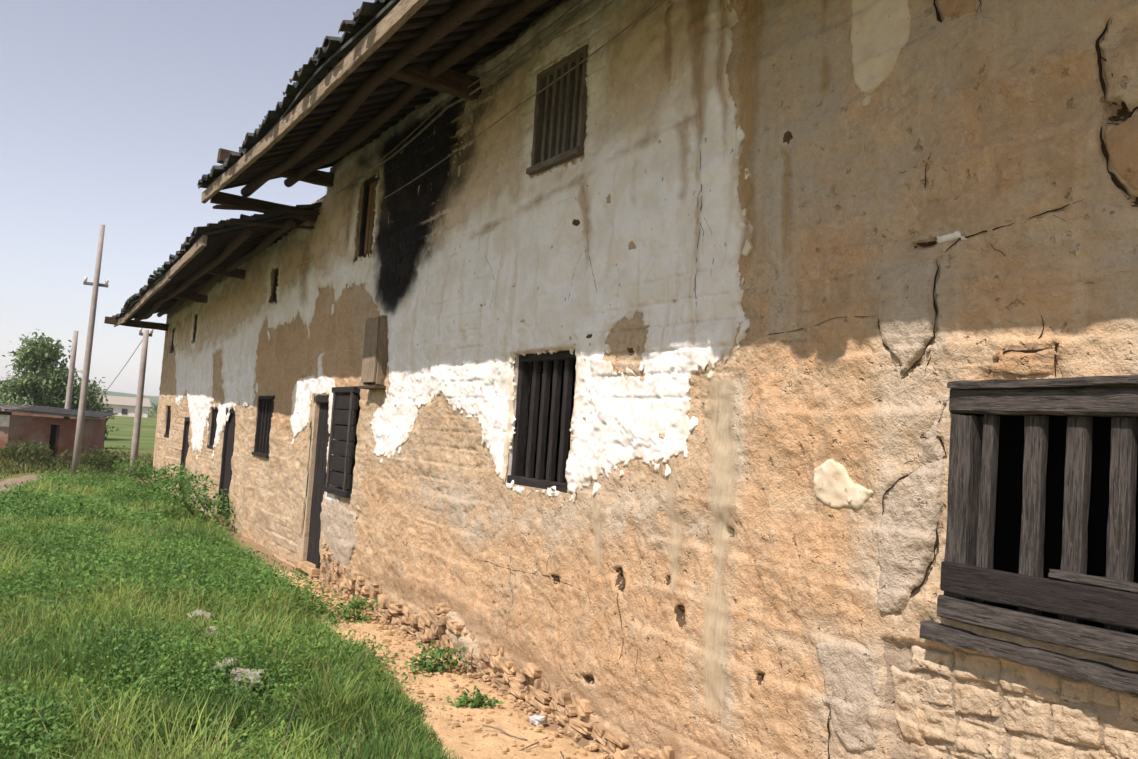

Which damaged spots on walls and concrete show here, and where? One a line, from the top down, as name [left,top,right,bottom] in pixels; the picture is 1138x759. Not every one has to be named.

water stain [609,0,707,120]
crack [1095,18,1113,99]
water stain [377,39,539,310]
crack [1100,126,1130,197]
spalling [1105,101,1138,207]
water stain [167,159,369,352]
peeling [167,0,753,503]
crack [769,199,1084,378]
crack [882,403,947,515]
spalling [615,567,626,592]
crack [897,506,943,613]
crack [819,709,831,759]